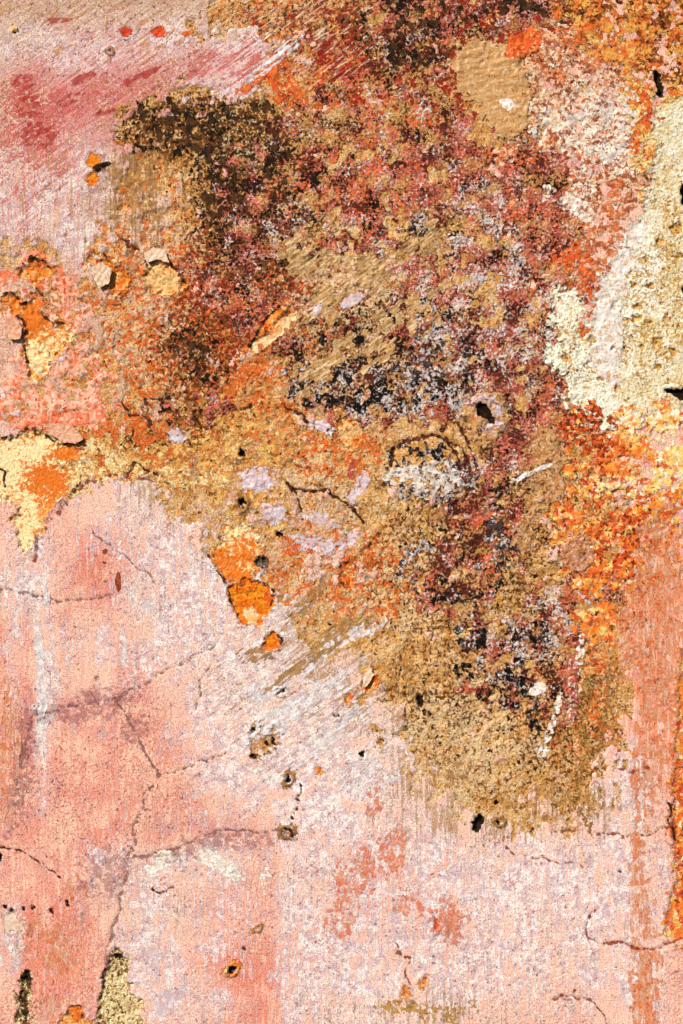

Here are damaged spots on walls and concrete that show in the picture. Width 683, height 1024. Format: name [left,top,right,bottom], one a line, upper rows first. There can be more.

rust [547,238,601,337]
spalling [88,454,137,484]
crack [272,462,380,556]
spalling [566,493,634,526]
rust [337,555,356,593]
spalling [481,659,502,678]
spalling [523,659,550,690]
rust [543,395,683,1024]
spalling [369,724,387,748]
rust [281,767,296,790]
spalling [609,780,621,811]
crack [0,645,302,988]